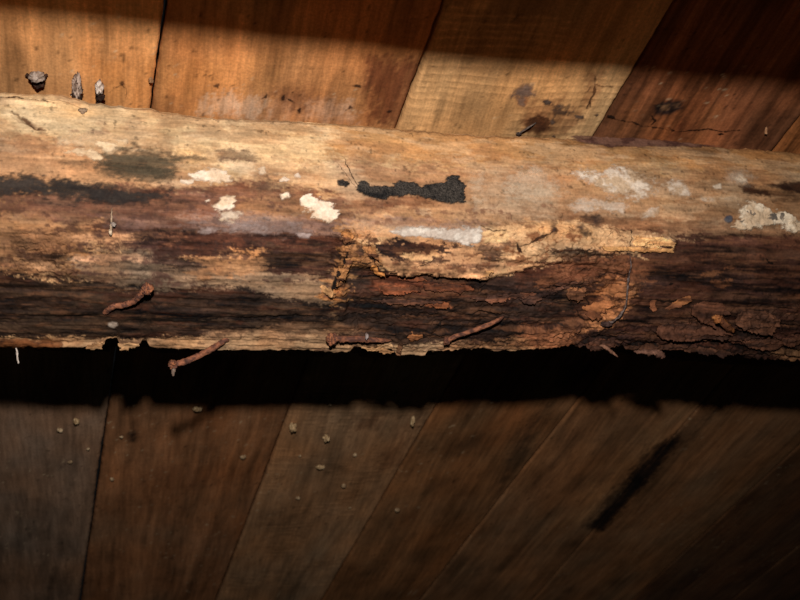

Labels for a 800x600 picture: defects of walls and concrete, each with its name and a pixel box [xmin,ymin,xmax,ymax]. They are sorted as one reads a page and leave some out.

crack [607,115,732,135]
leakage [0,135,191,207]
leakage [573,166,690,202]
leakage [734,174,800,196]
peeling [370,261,494,281]
peeling [585,296,800,360]